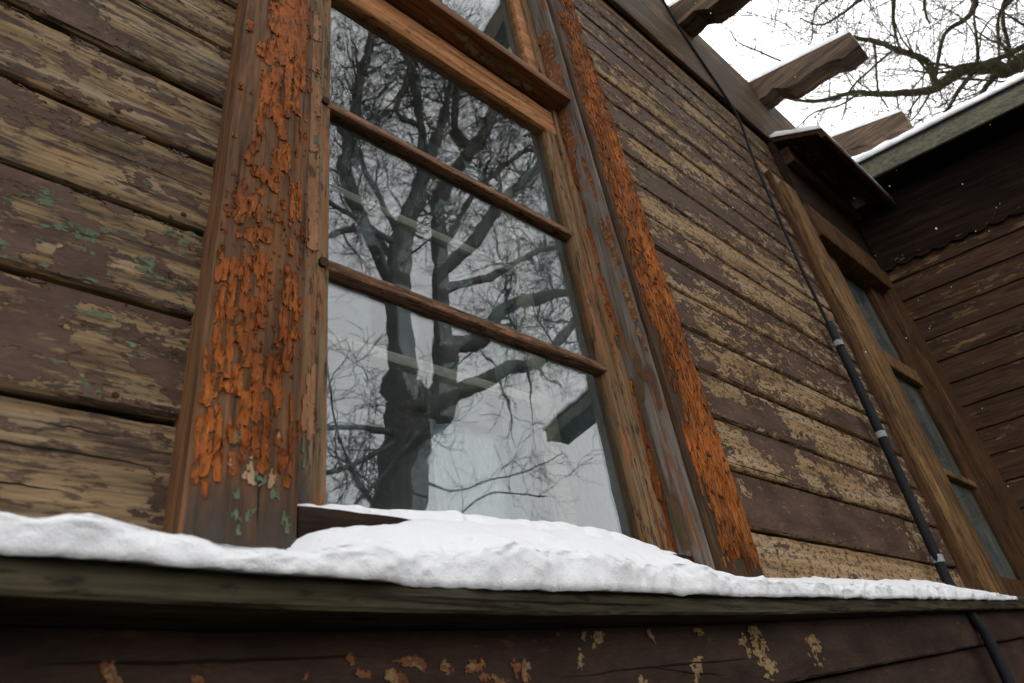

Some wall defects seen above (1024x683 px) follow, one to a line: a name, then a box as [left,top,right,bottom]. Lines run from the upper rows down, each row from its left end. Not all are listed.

peeling [537,30,564,88]
peeling [556,107,598,212]
peeling [0,0,206,415]
peeling [139,0,323,501]
peeling [573,0,962,588]
peeling [126,466,167,526]
peeling [99,660,123,683]
peeling [384,654,531,683]
peeling [577,631,605,670]
peeling [689,656,703,683]
peeling [738,625,778,681]
peeling [804,634,825,668]